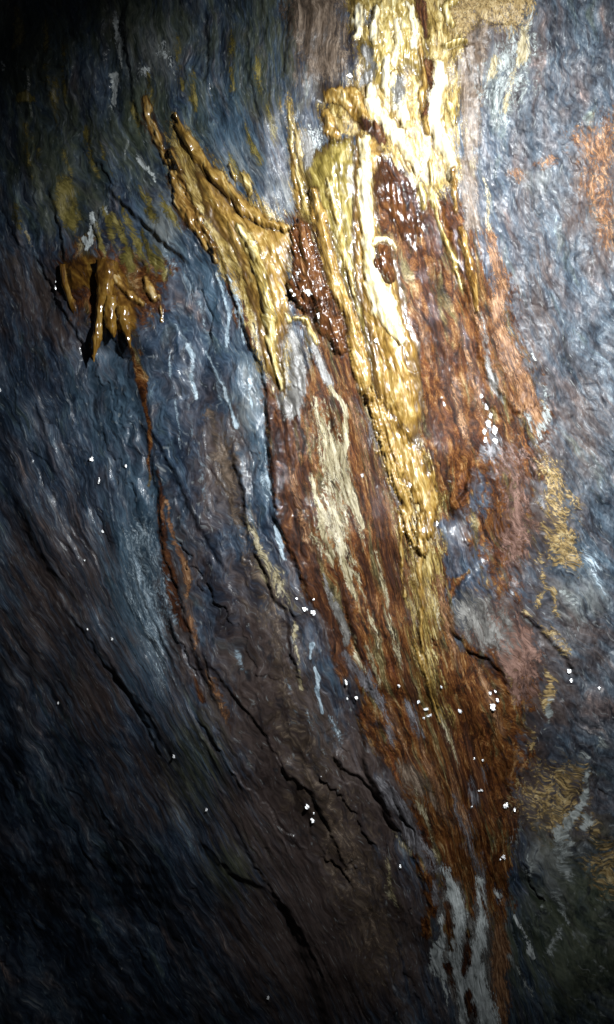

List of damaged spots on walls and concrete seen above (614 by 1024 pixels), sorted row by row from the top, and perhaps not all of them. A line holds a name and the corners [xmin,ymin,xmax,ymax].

damp [156,36,198,112]
damp [344,0,491,230]
damp [477,15,548,133]
damp [81,56,521,770]
rust [202,409,405,997]
rust [260,0,614,1024]